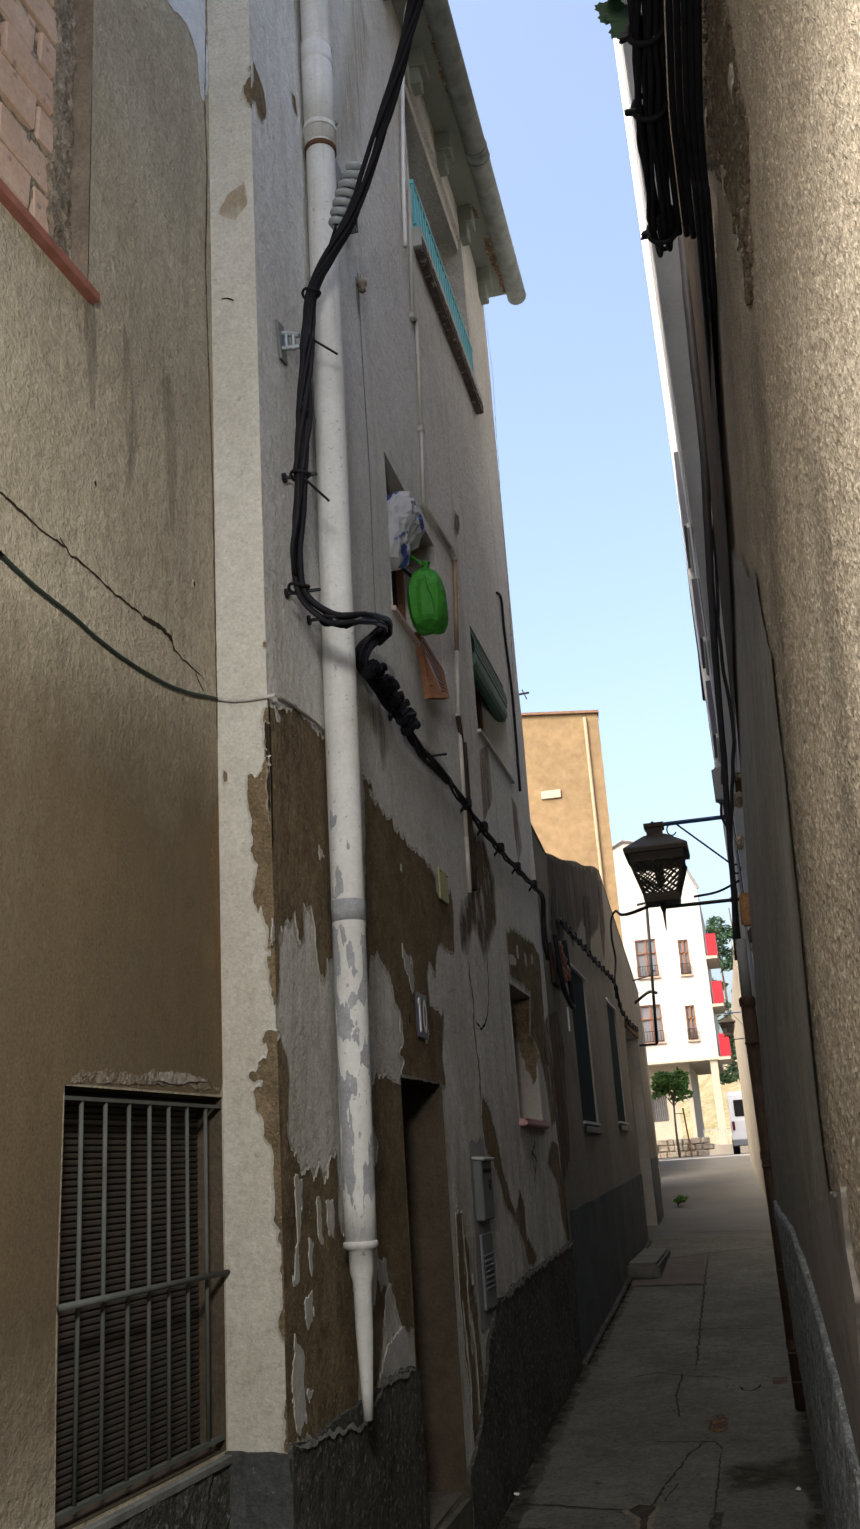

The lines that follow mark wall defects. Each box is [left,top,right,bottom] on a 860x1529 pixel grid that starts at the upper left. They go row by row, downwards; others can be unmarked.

peeling [167,0,209,101]
peeling [241,60,267,124]
crack [0,0,234,737]
peeling [222,698,455,1454]
peeling [480,1093,537,1269]
peeling [505,926,572,1243]
crack [526,1230,762,1518]